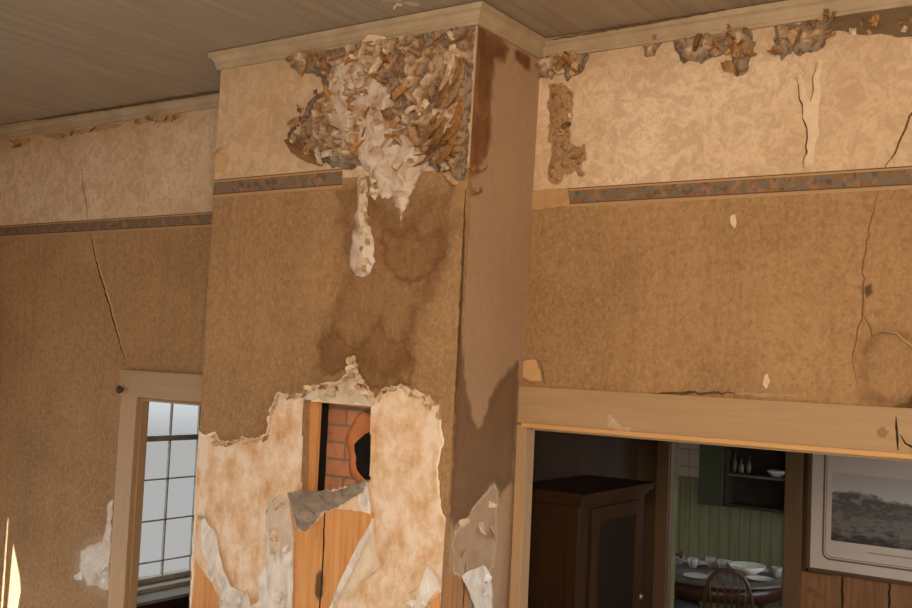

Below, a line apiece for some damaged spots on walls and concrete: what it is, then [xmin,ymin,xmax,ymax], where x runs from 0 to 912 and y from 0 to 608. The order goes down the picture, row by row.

flaking render [285,26,476,226]
crack [885,112,912,167]
crack [81,169,126,359]
crack [852,190,912,383]
spalling [211,355,441,492]
flaking render [73,499,114,591]
peeling [452,484,498,584]